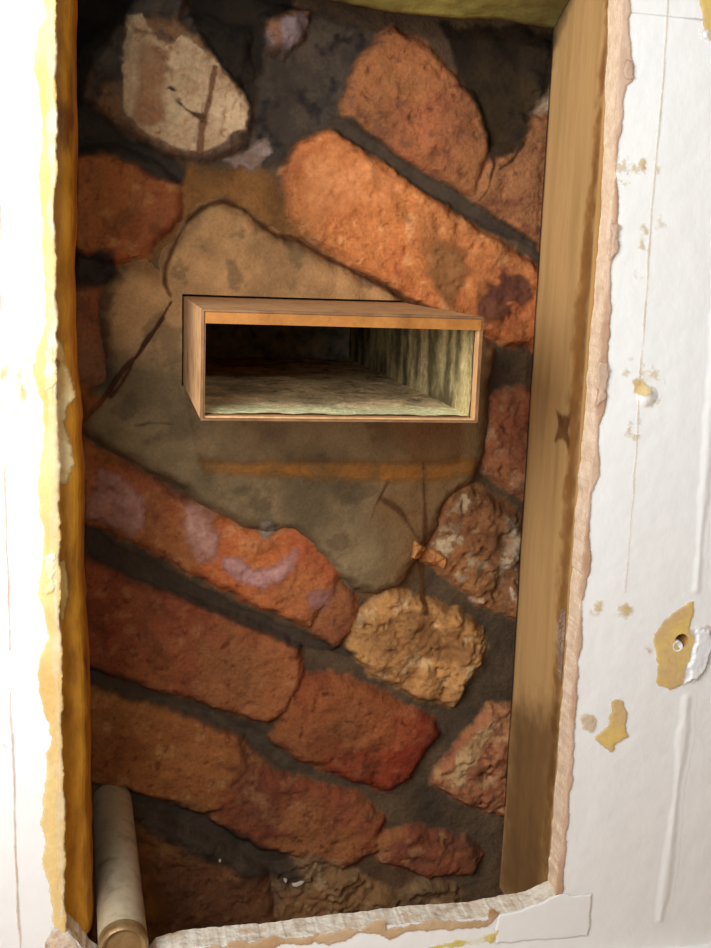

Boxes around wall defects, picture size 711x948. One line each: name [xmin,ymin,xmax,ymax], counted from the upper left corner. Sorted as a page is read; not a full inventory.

spalling [700,0,711,40]
peeling [614,0,634,162]
spalling [428,243,466,304]
spalling [478,269,532,321]
peeling [33,0,81,948]
crack [2,470,10,607]
crack [377,480,428,615]
spalling [412,541,446,569]
peeling [555,179,629,895]
spalling [411,615,472,661]
spalling [654,601,711,690]
peeling [206,908,499,948]